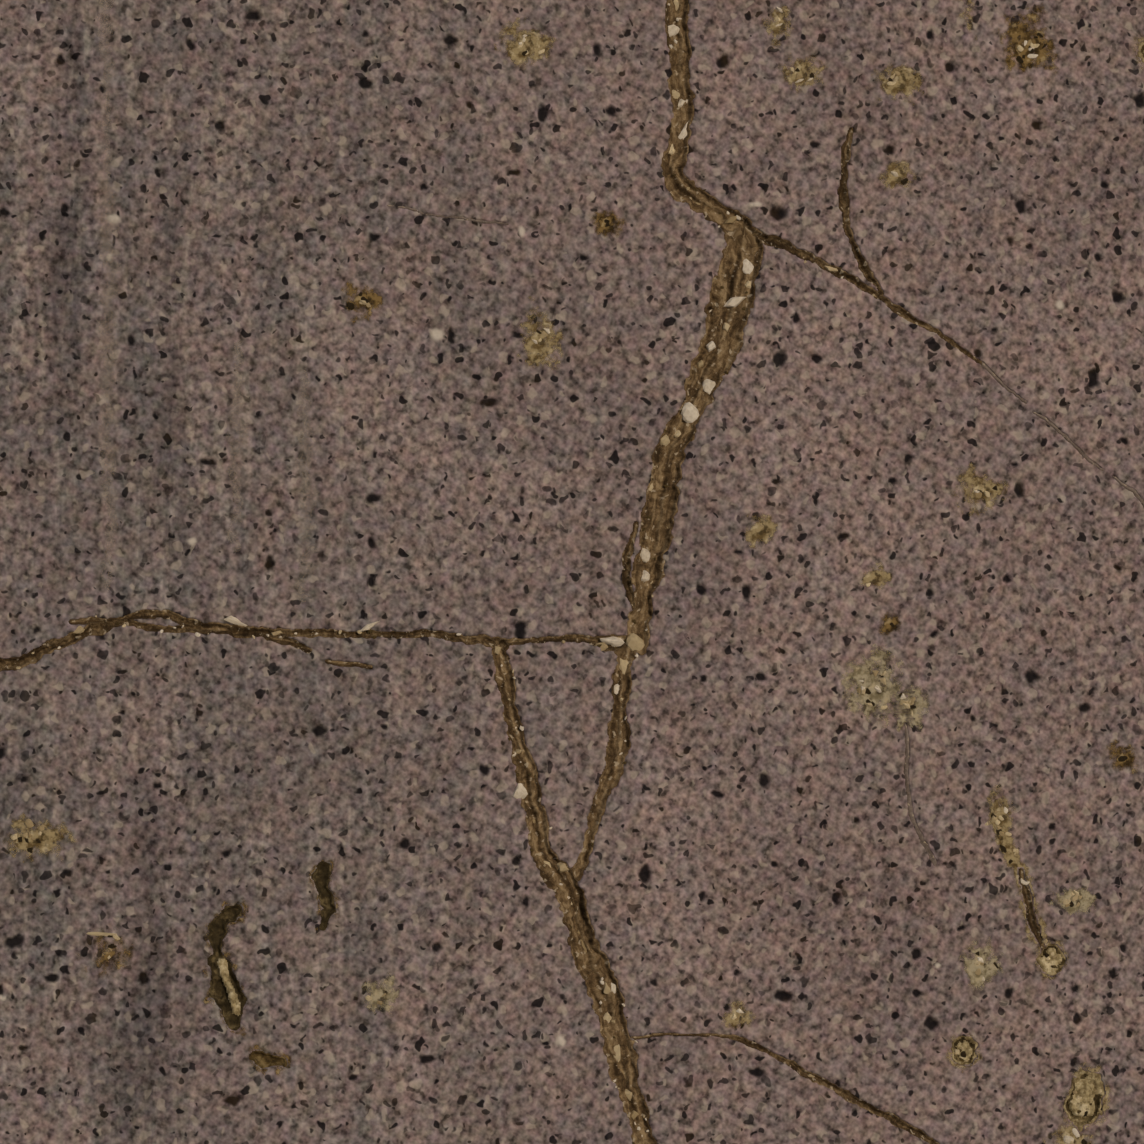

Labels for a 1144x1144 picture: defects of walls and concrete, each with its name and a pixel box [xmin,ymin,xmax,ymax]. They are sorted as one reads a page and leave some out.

crack [387,205,509,225]
crack [1032,411,1104,471]
crack [1112,476,1144,507]
crack [492,0,1027,1144]
crack [0,609,627,672]
spalling [309,860,339,931]
crack [1018,868,1046,951]
spalling [204,901,247,1036]
spalling [249,1045,291,1074]
spalling [947,1034,982,1067]
spalling [1063,1066,1110,1132]